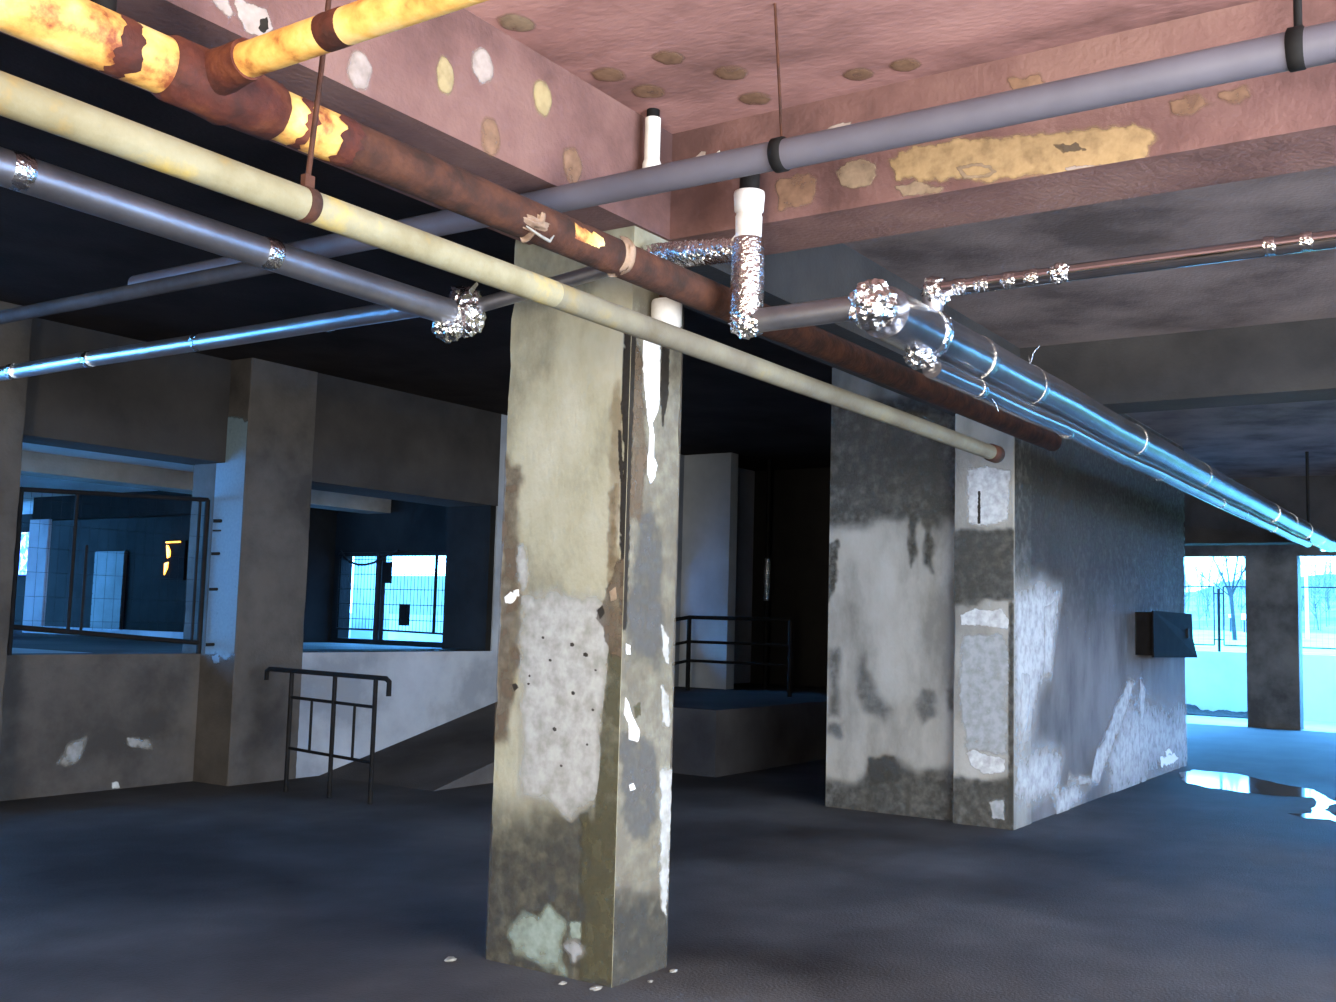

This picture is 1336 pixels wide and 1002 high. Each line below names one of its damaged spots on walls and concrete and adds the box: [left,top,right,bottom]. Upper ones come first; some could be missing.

rust [92,10,147,79]
rust [283,96,322,150]
rust [318,111,731,322]
spalling [837,124,1155,196]
rust [761,326,1062,451]
leakage [825,584,1187,830]